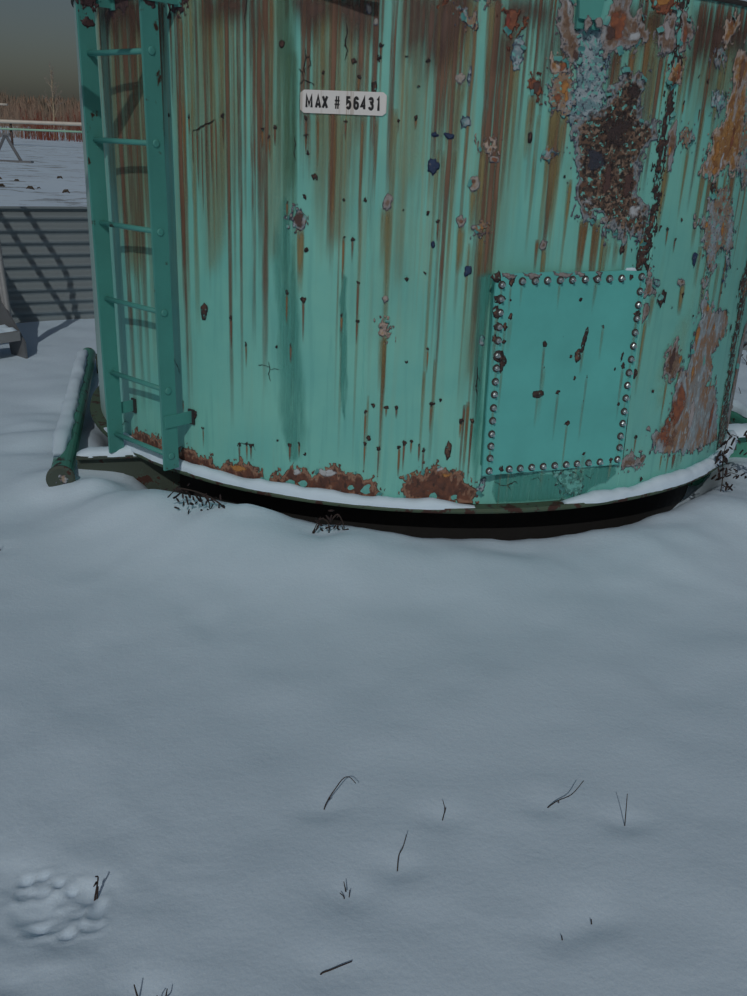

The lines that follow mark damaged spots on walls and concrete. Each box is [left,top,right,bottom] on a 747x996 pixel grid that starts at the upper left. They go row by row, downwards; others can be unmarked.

rust [75,0,566,347]
peeling [479,217,610,374]
peeling [510,0,747,482]
rust [131,427,162,450]
rust [178,443,385,496]
rust [398,395,479,504]